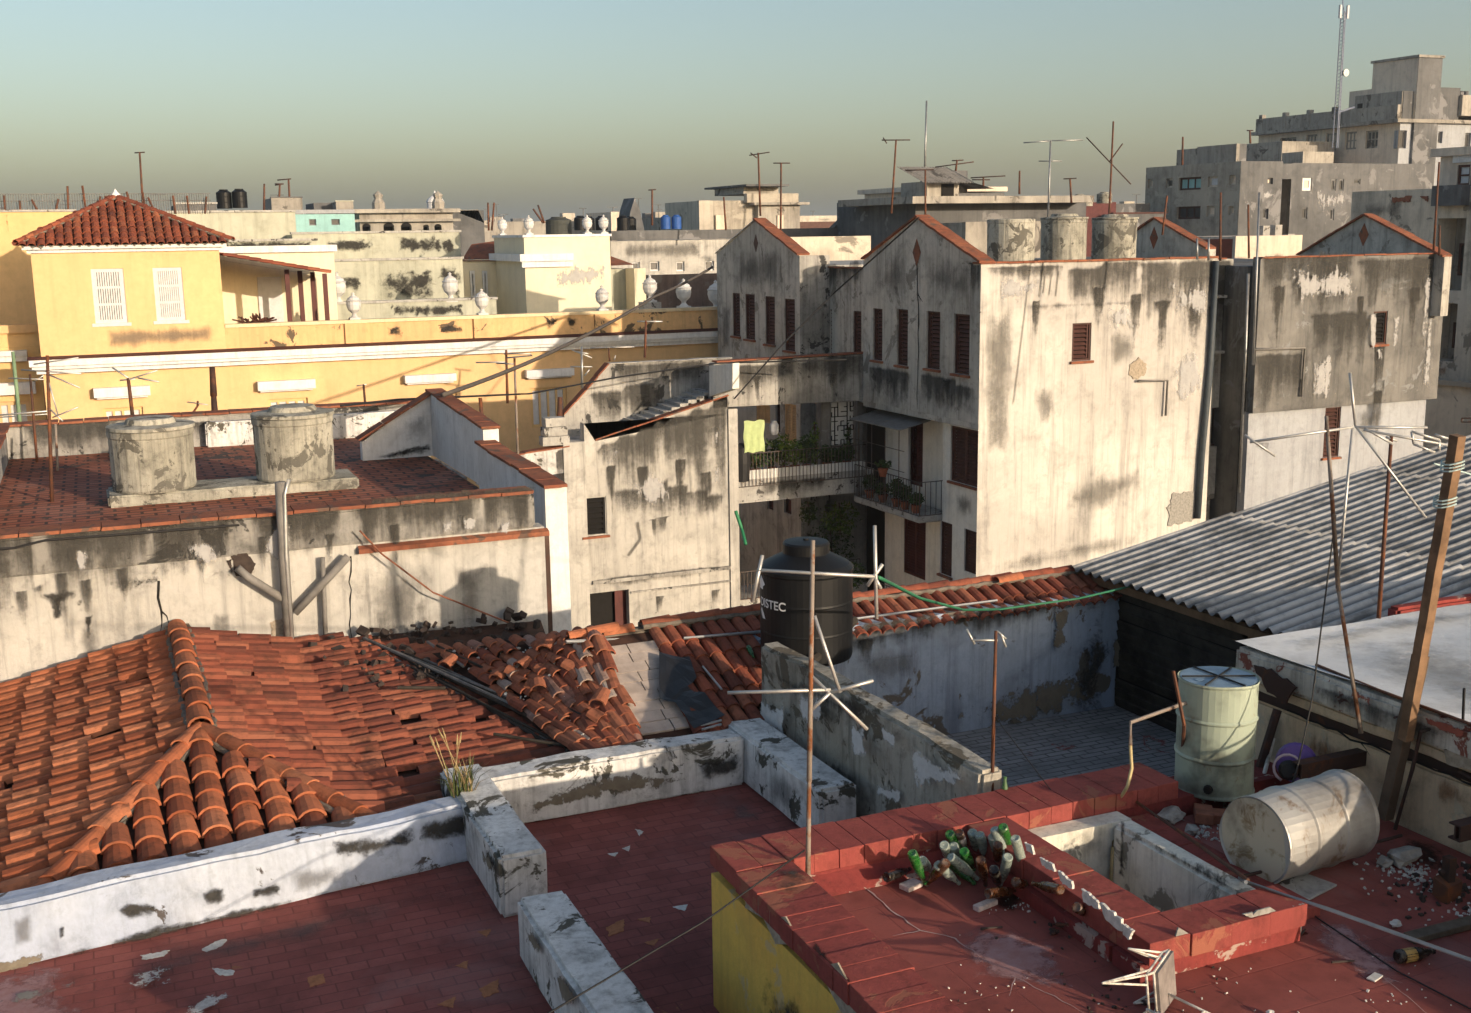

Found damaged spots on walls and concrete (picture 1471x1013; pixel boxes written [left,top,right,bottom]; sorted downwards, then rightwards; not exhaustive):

water stain [939,260,1230,343]
peeling [1293,265,1352,304]
water stain [1116,341,1128,359]
water stain [992,325,1006,441]
water stain [1082,484,1114,501]
water stain [0,519,236,638]
peeling [760,694,821,733]
peeling [985,672,1096,724]
spalling [1253,665,1297,704]
peeling [852,726,895,755]
spalling [1425,718,1471,771]
peeling [877,752,960,803]